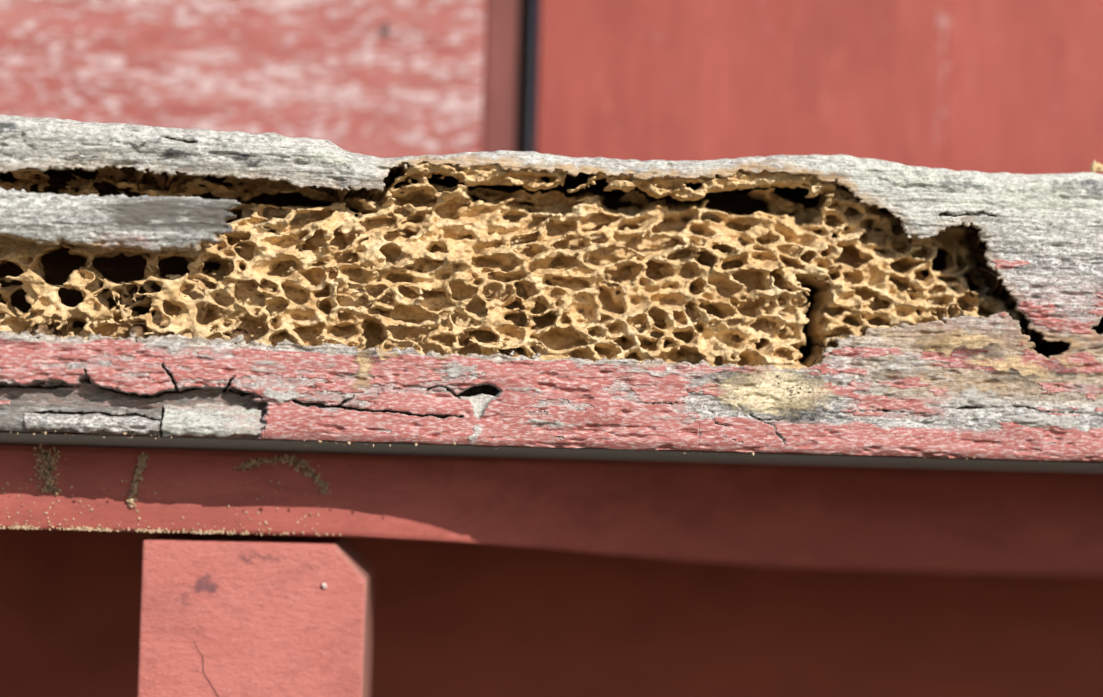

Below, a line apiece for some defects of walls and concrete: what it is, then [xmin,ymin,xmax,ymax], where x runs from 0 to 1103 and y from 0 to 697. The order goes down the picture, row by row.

peeling [991,260,1030,269]
peeling [998,292,1103,334]
crack [0,364,251,435]
peeling [0,339,1103,462]
crack [193,641,219,697]